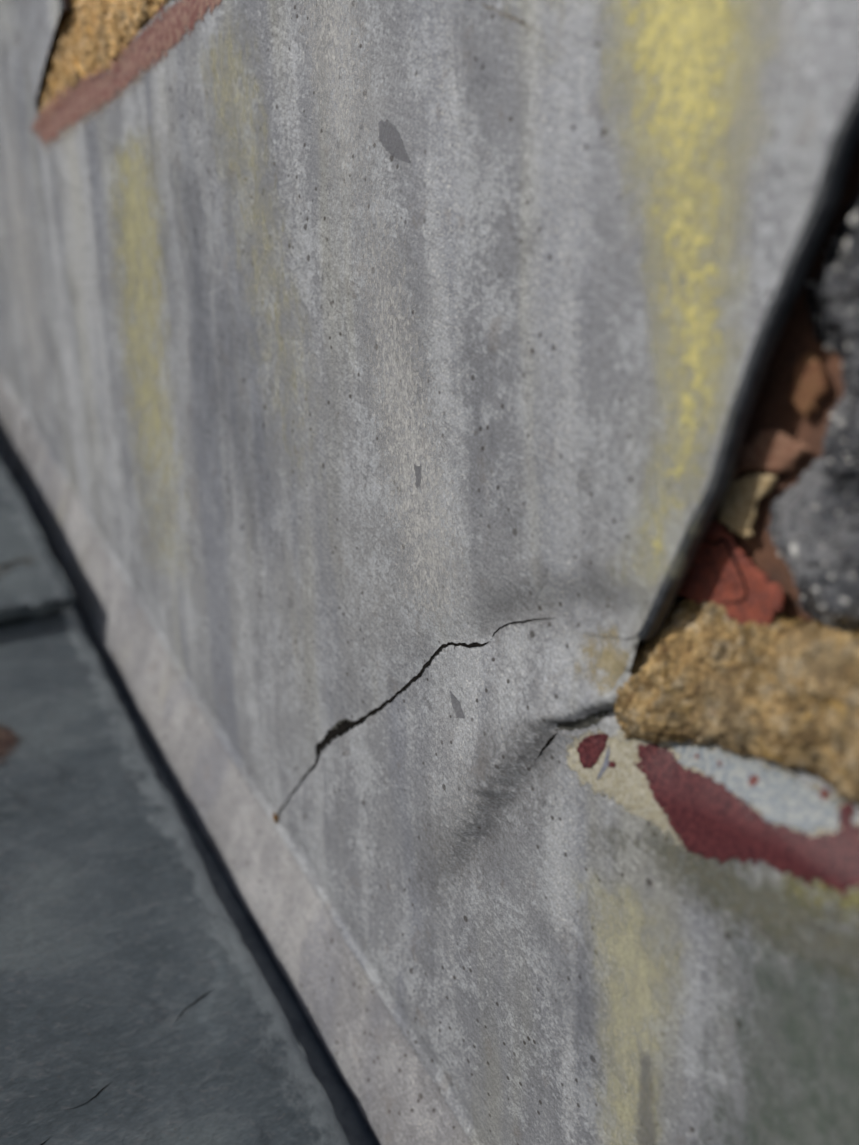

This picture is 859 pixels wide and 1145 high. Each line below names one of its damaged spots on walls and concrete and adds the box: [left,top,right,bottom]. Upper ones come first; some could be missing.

peeling [32,0,221,144]
leakage [603,0,772,580]
spalling [790,351,828,418]
spalling [677,429,810,625]
crack [278,618,552,816]
peeling [566,729,859,897]